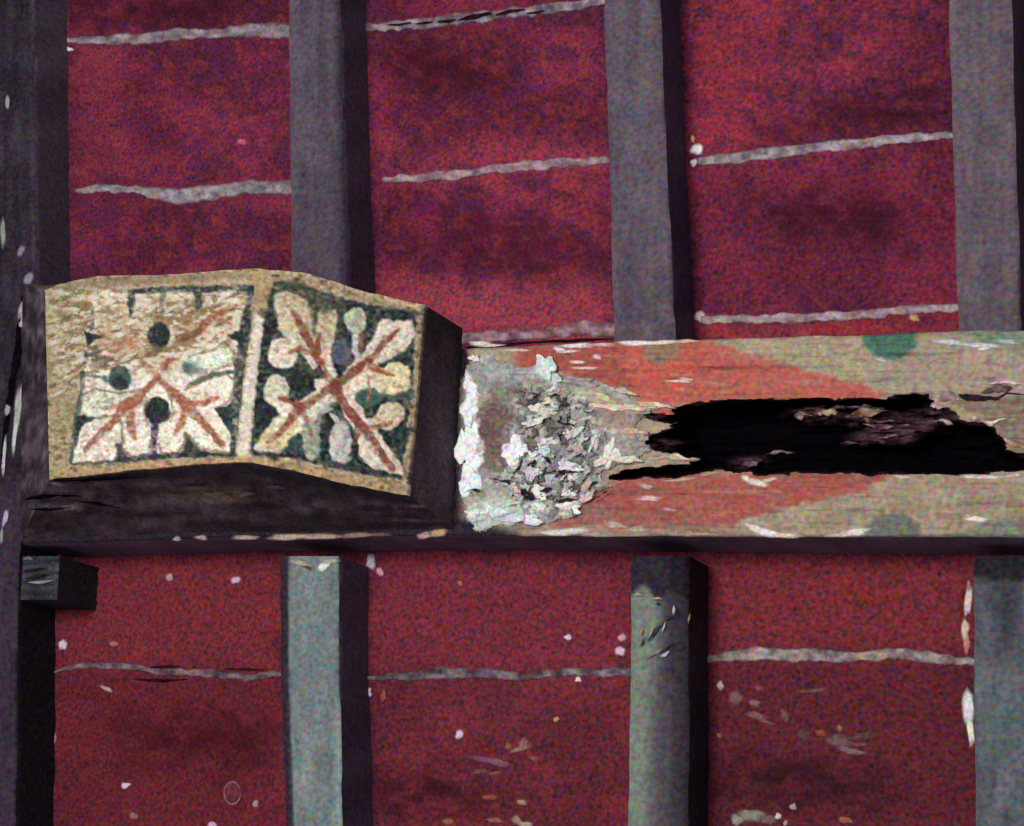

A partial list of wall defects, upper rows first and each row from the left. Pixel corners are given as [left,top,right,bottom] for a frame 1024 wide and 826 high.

peeling [454,339,697,535]
crack [25,476,150,511]
peeling [742,476,777,486]